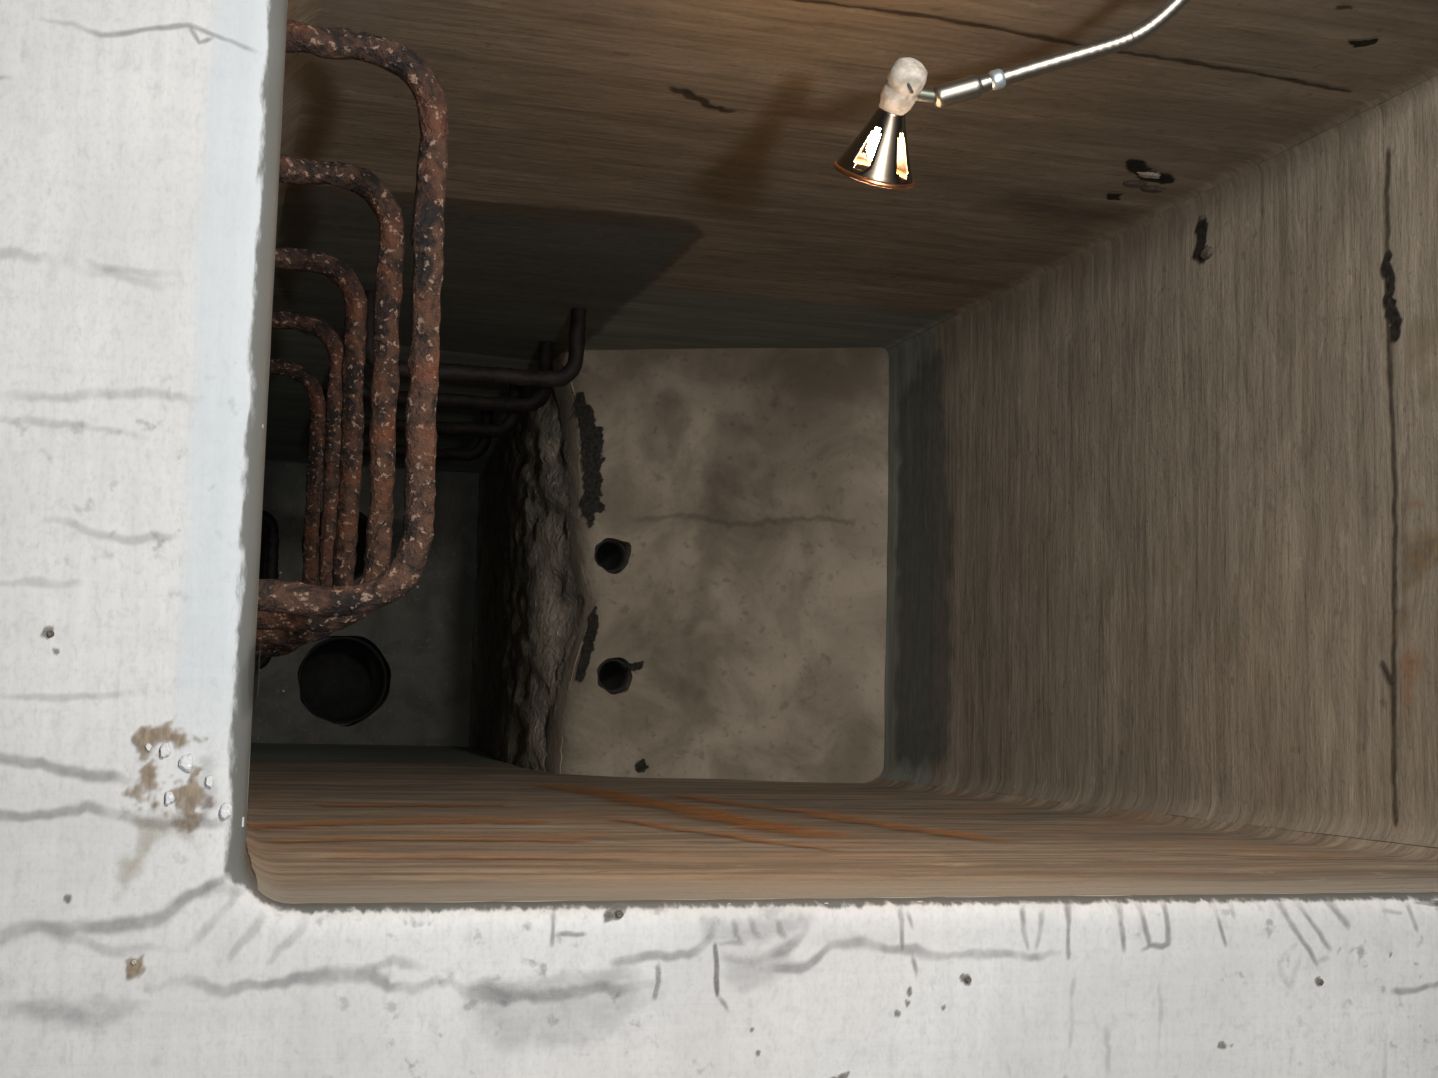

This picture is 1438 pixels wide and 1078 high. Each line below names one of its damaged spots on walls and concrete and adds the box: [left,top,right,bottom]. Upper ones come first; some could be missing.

crack [792,0,1081,46]
crack [1115,51,1349,92]
crack [1308,149,1402,858]
crack [712,945,720,994]